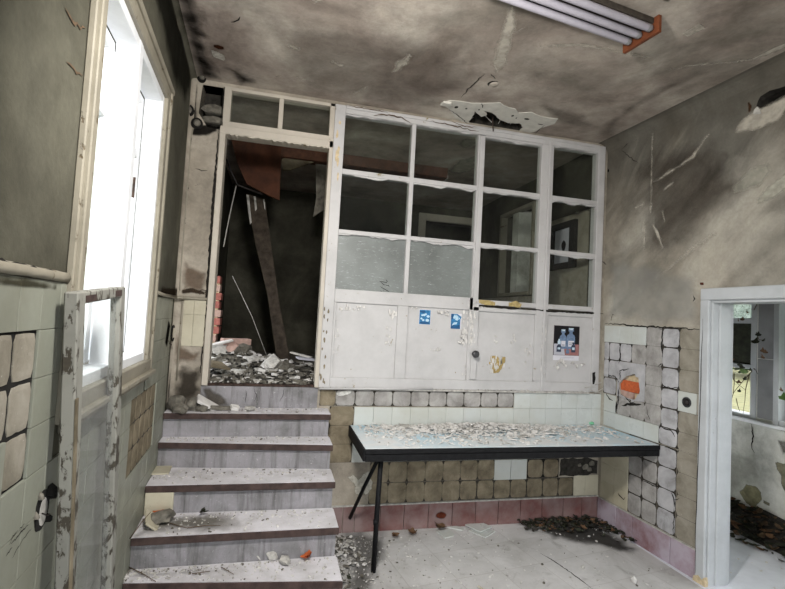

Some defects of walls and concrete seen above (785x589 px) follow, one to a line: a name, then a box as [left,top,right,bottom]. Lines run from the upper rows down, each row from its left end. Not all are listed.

water stain [494,7,514,70]
flaking render [441,100,558,133]
spalling [753,86,785,114]
peeling [585,327,700,548]
peeling [775,462,785,490]
peeling [740,485,770,507]